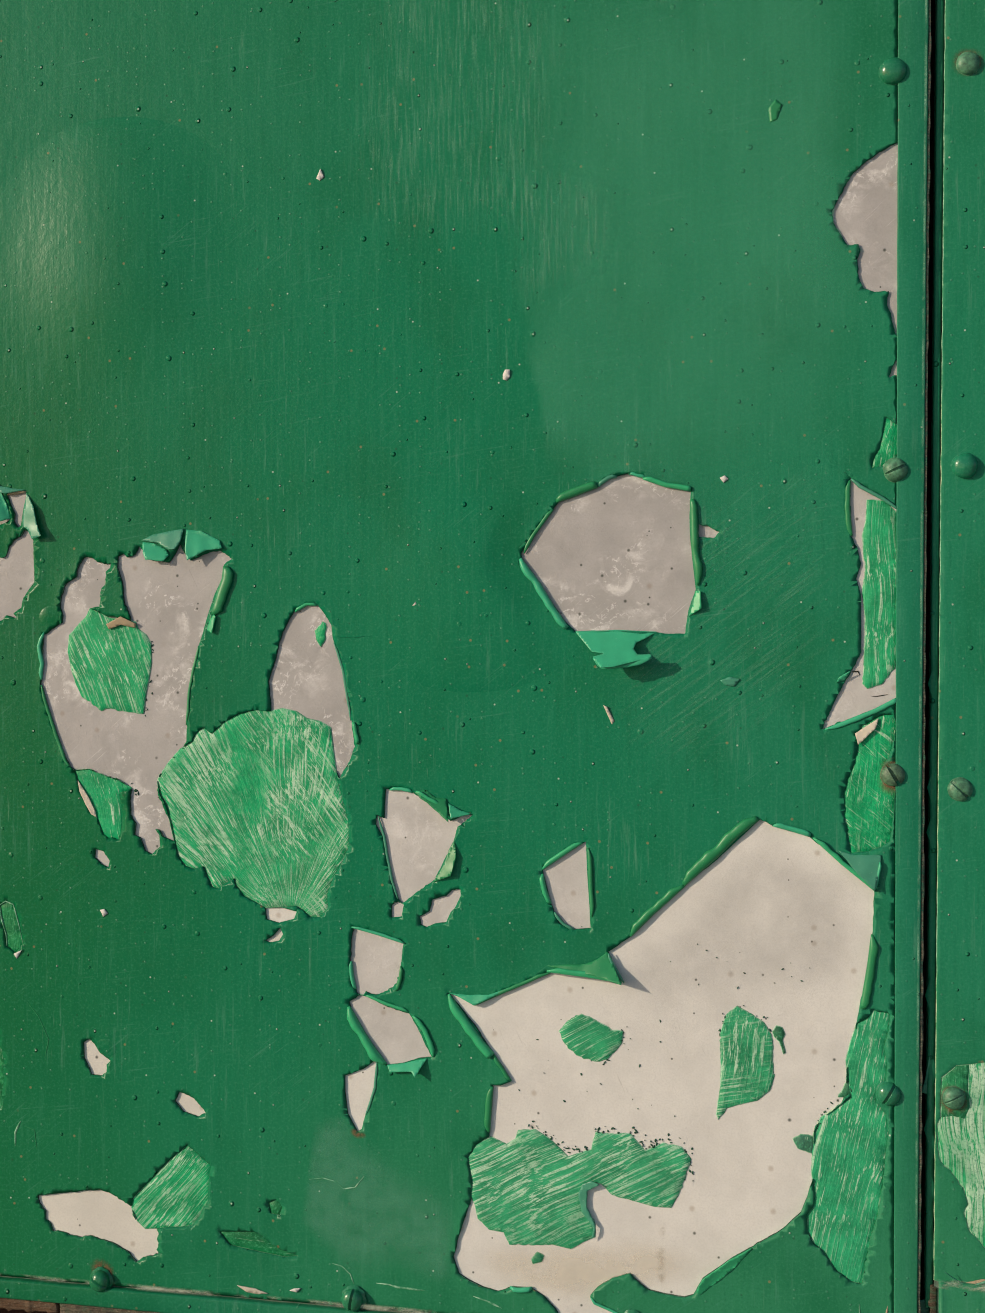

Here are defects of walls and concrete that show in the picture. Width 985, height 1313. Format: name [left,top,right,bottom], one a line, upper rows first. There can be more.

peeling [832,143,898,336]
peeling [0,486,41,621]
peeling [37,528,233,854]
peeling [269,603,359,777]
peeling [519,472,719,669]
peeling [823,478,897,745]
peeling [96,849,110,867]
peeling [376,787,472,927]
peeling [345,927,435,1131]
peeling [448,816,881,1313]
peeling [39,1190,159,1261]